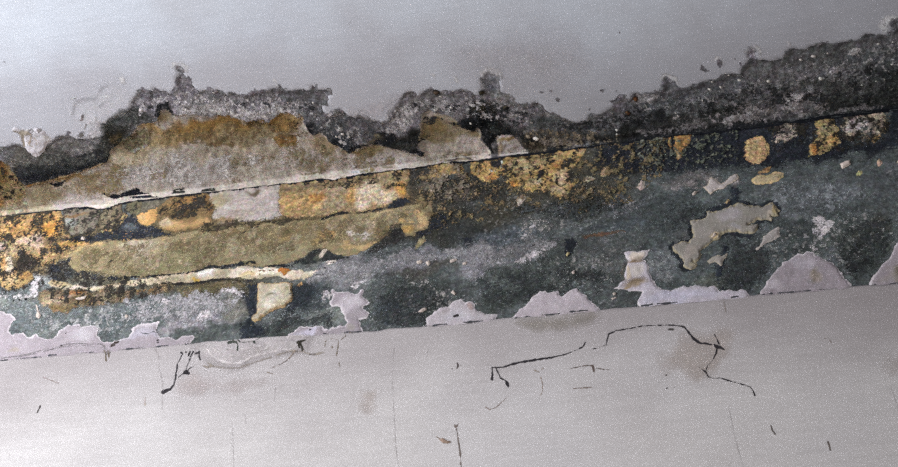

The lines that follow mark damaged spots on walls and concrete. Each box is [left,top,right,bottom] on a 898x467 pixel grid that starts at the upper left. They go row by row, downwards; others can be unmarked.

crack [0,108,898,217]
leakage [0,15,898,344]
flaking render [808,113,889,157]
flaking render [0,109,798,327]
peeling [760,251,852,296]
peeling [869,243,898,285]
peeling [0,311,195,360]
crack [0,331,201,406]
peeling [288,289,370,336]
crack [267,319,493,374]
crack [485,302,756,410]